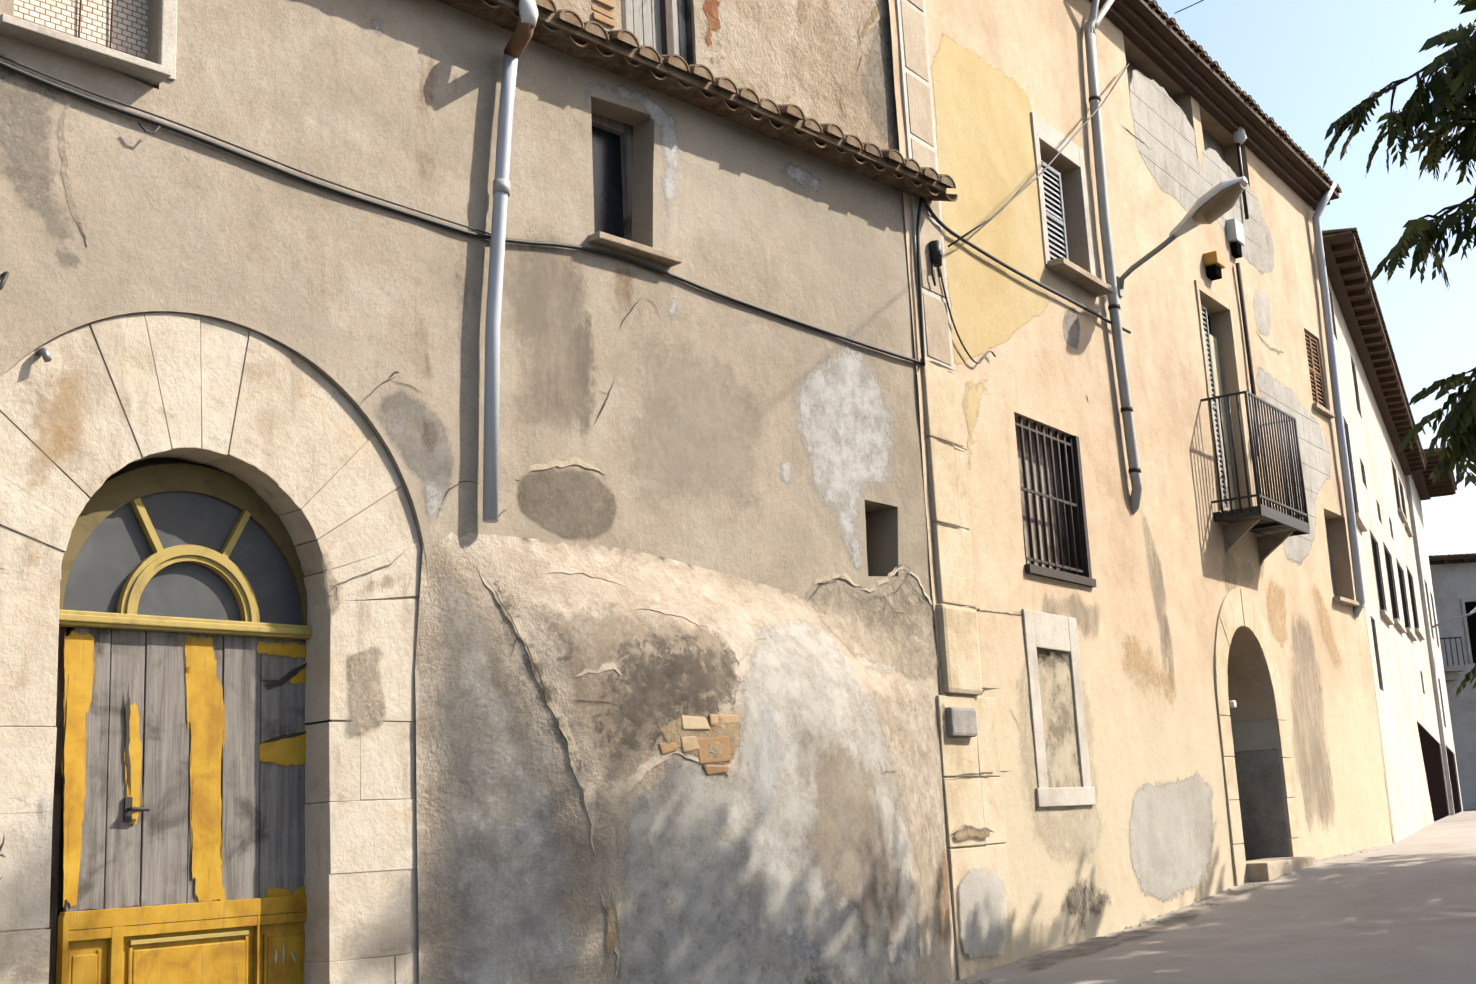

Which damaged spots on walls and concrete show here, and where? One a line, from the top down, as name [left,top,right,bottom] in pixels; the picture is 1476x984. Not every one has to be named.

spalling [703,0,721,64]
peeling [1129,70,1283,355]
peeling [1257,367,1331,566]
peeling [42,630,98,907]
peeling [124,689,143,824]
peeling [165,635,226,904]
crack [476,566,624,712]
peeling [430,567,740,984]
damp [497,580,746,787]
crack [807,560,937,625]
spalling [805,566,941,679]
spalling [874,694,1008,939]